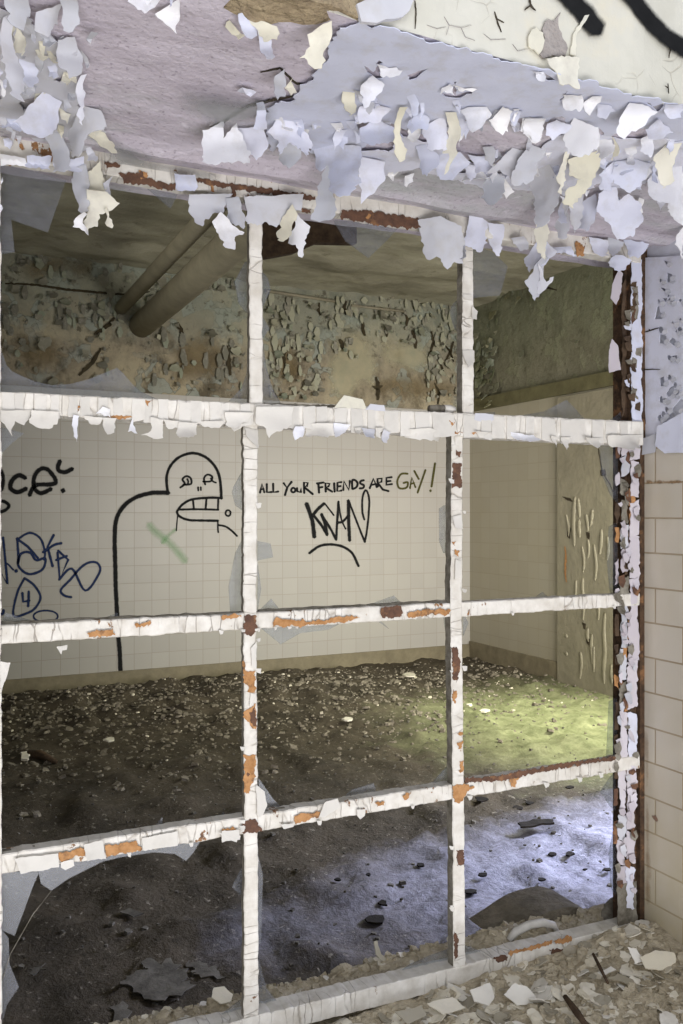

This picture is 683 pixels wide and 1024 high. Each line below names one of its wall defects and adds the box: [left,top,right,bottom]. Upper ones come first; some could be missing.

crack [414,1,527,51]
rust [104,162,176,191]
rust [196,178,315,213]
rust [340,209,421,230]
peeling [0,0,683,521]
rust [221,613,258,636]
peeling [0,661,11,689]
peeling [613,520,640,894]
rust [452,702,633,866]
rust [221,819,262,834]
peeling [219,785,267,842]
peeling [14,840,106,874]